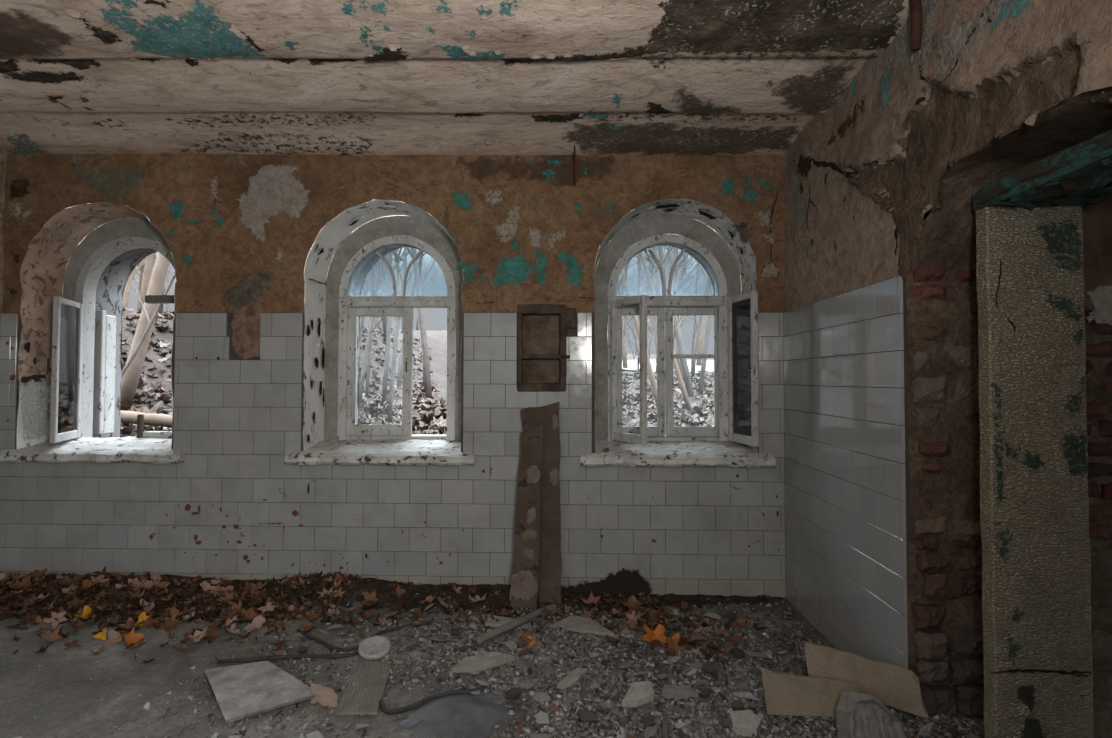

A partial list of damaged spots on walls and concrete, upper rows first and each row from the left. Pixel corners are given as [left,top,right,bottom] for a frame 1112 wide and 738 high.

leakage [0,10,71,59]
spalling [0,59,133,128]
peeling [46,0,411,68]
spalling [162,113,375,243]
leakage [458,88,799,186]
spalling [426,0,1085,293]
leakage [624,0,906,114]
peeling [221,272,274,360]
spalling [1045,286,1112,345]
peeling [18,341,50,440]
peeling [1013,685,1043,738]
crack [990,669,1092,677]